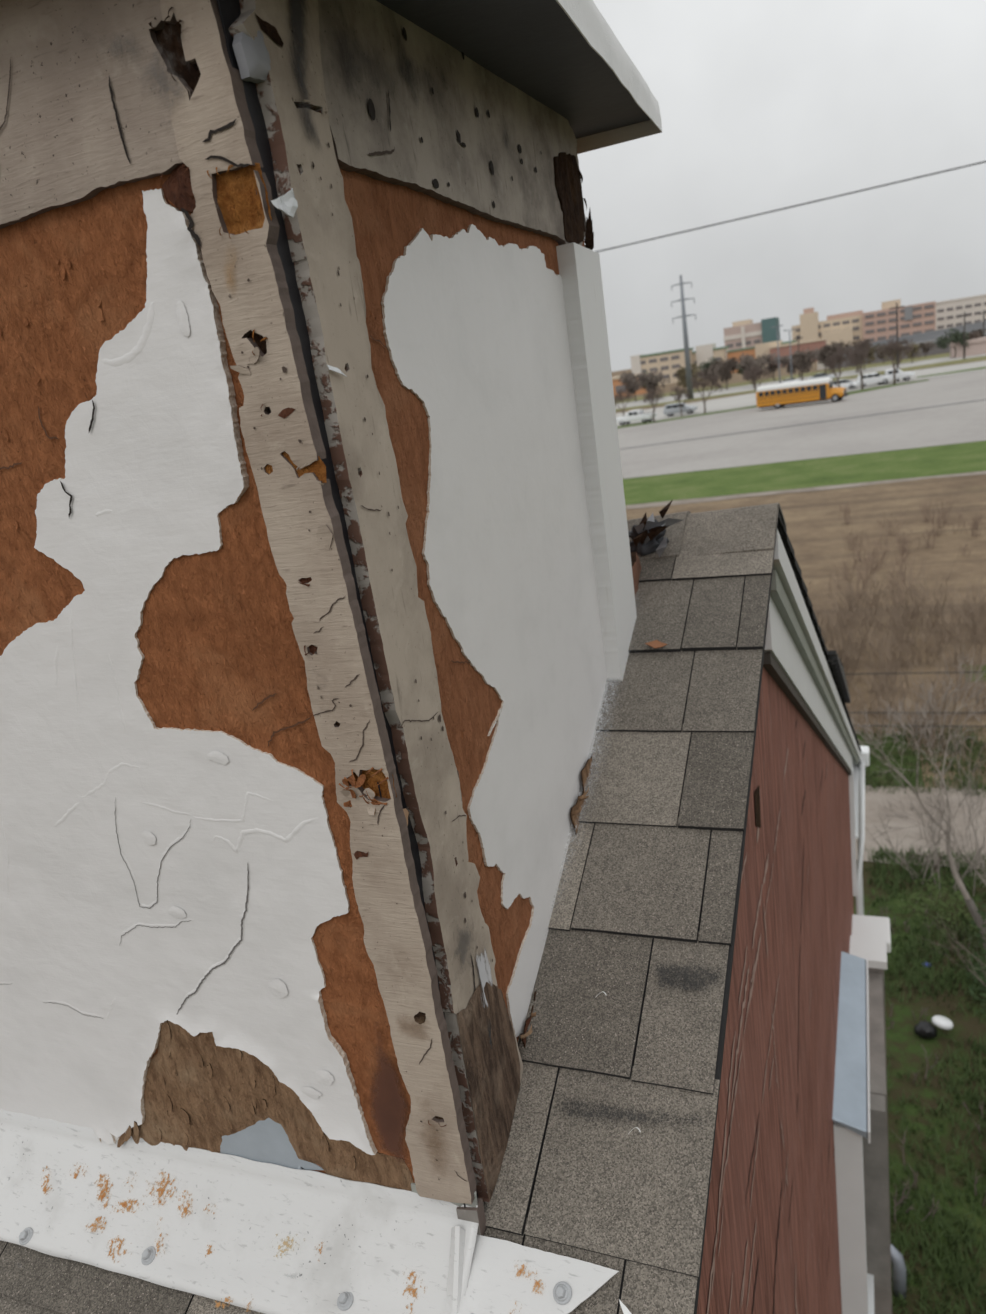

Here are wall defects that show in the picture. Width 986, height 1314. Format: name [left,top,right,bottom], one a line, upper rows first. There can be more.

crack [0,58,11,130]
crack [109,76,131,165]
leakage [290,0,319,142]
spalling [207,163,272,239]
peeling [0,163,196,656]
peeling [312,161,559,1015]
peeling [136,294,422,1183]
crack [115,792,273,946]
crack [177,861,251,1014]
corrosion [74,1166,216,1263]
corrosion [403,1272,425,1312]
corrosion [516,1264,543,1294]